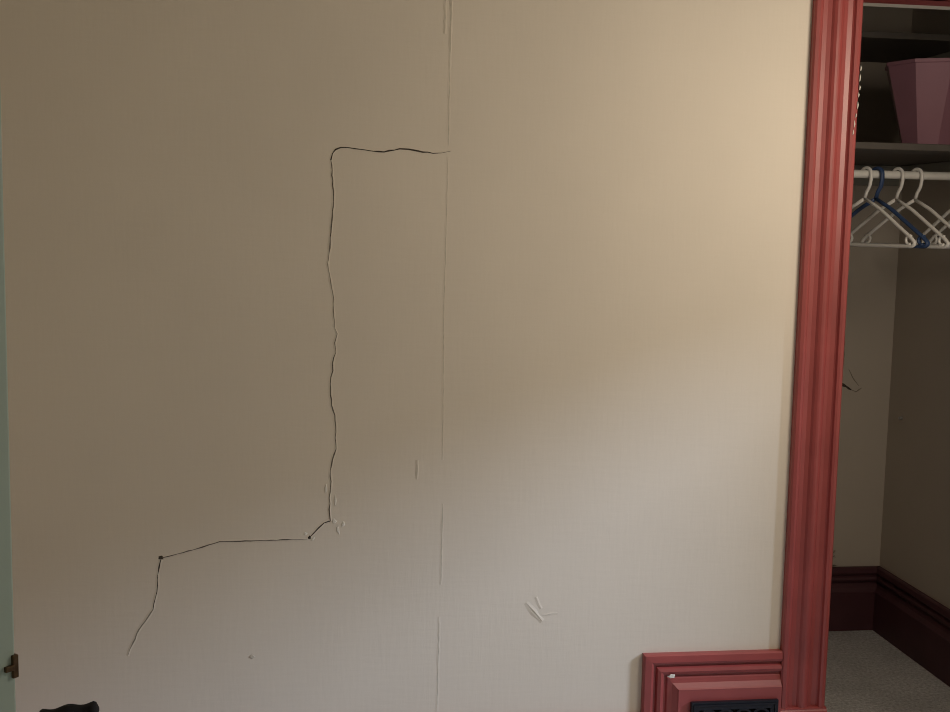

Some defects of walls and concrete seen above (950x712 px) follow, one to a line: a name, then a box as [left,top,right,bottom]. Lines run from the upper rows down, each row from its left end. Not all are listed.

crack [126,0,453,656]